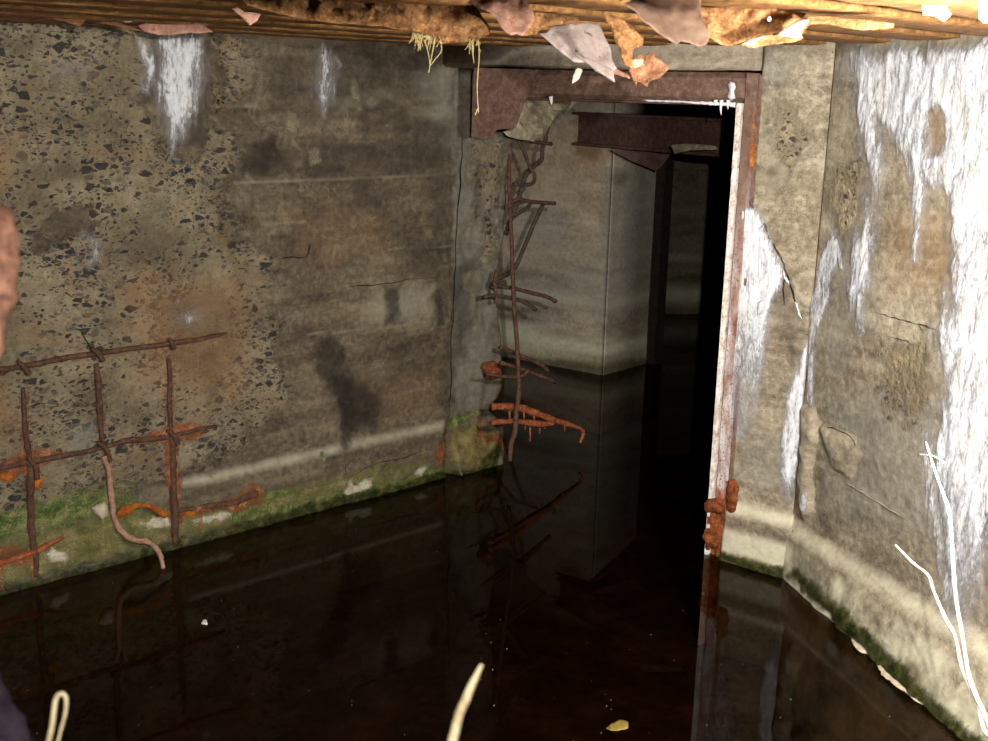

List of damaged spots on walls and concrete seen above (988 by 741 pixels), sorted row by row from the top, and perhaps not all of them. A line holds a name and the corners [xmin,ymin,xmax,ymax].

leakage [138,34,203,151]
leakage [732,207,783,434]
leakage [780,37,988,625]
corrosion [0,450,62,489]
corrosion [117,424,263,532]
corrosion [705,498,727,557]
leakage [878,665,922,704]